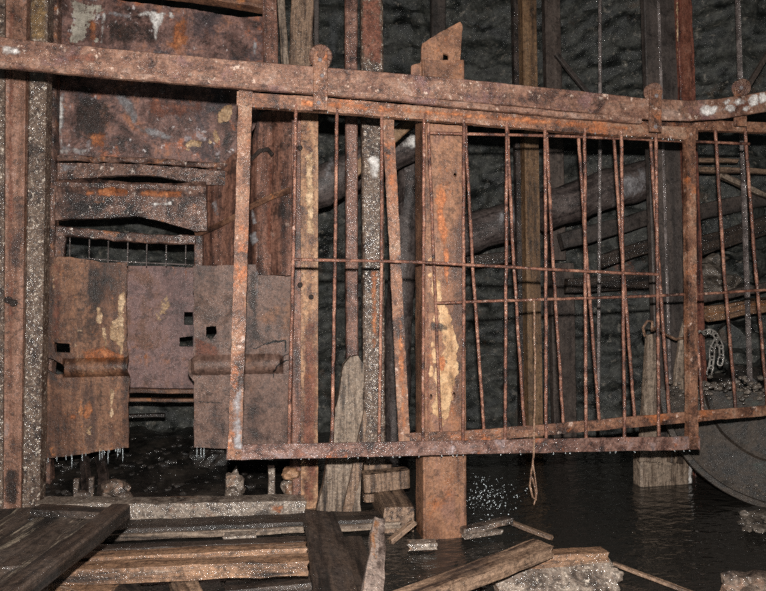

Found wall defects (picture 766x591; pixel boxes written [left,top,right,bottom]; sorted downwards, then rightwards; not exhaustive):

water stain [102,11,174,42]
corrosion [406,108,597,127]
corrosion [435,184,449,286]
corrosion [85,348,123,361]
corrosion [296,450,317,501]